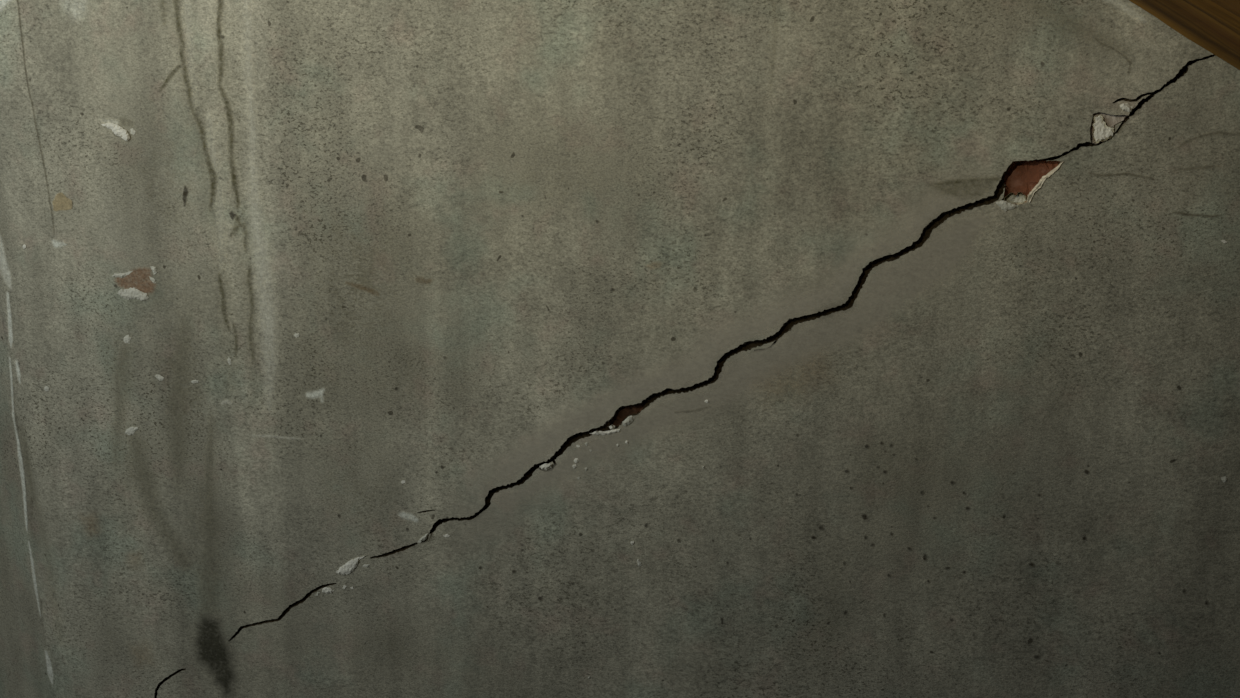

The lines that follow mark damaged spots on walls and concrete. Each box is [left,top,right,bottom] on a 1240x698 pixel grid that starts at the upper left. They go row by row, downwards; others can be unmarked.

flaking render [1090,103,1133,144]
flaking render [996,160,1064,212]
peeling [112,266,157,301]
crack [370,38,1219,559]
crack [228,583,337,642]
crack [154,668,186,698]